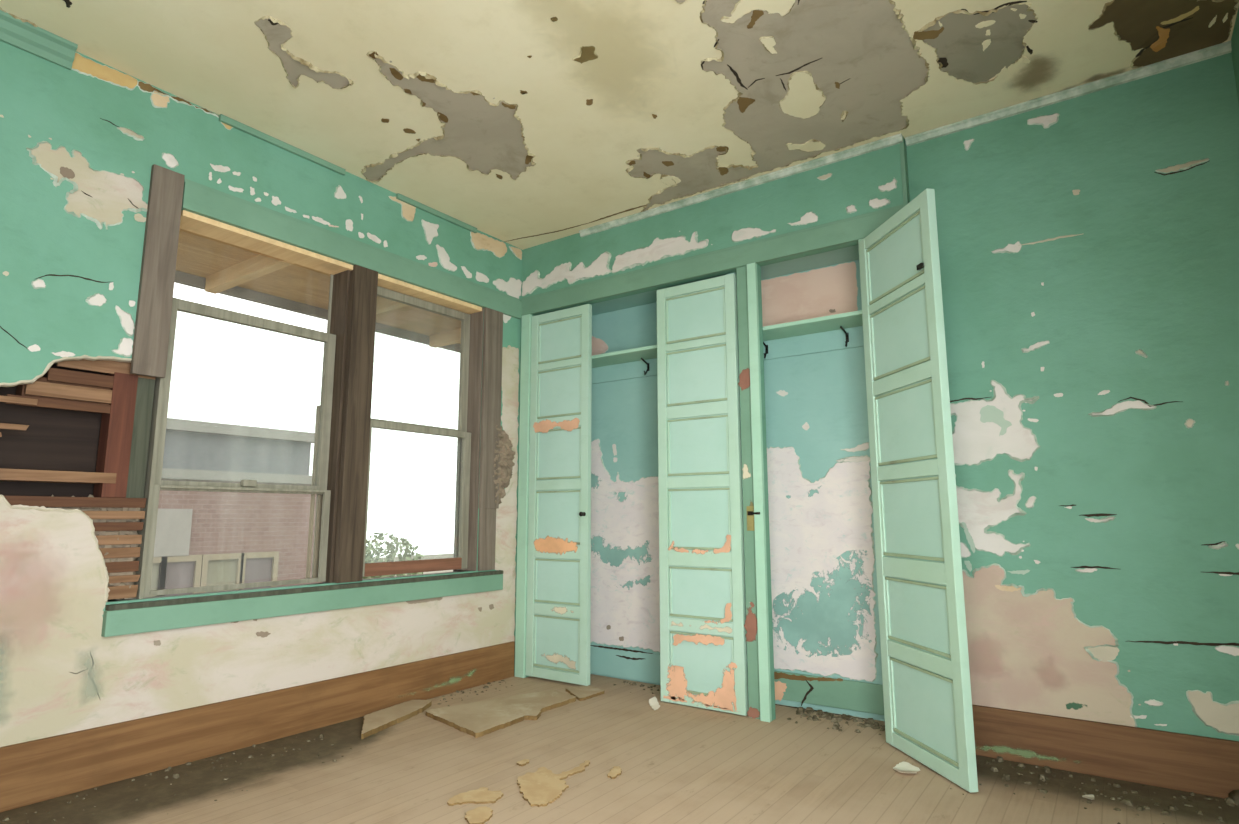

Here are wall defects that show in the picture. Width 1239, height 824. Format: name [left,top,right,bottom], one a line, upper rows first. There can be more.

peeling [1088,0,1239,68]
peeling [361,51,536,182]
peeling [625,0,1038,214]
peeling [0,274,580,747]
peeling [534,439,732,652]
peeling [767,442,878,701]
peeling [950,361,1167,727]
crack [1060,504,1117,523]
crack [1071,565,1117,573]
crack [1204,570,1239,578]
crack [775,680,867,720]
crack [1125,641,1239,656]